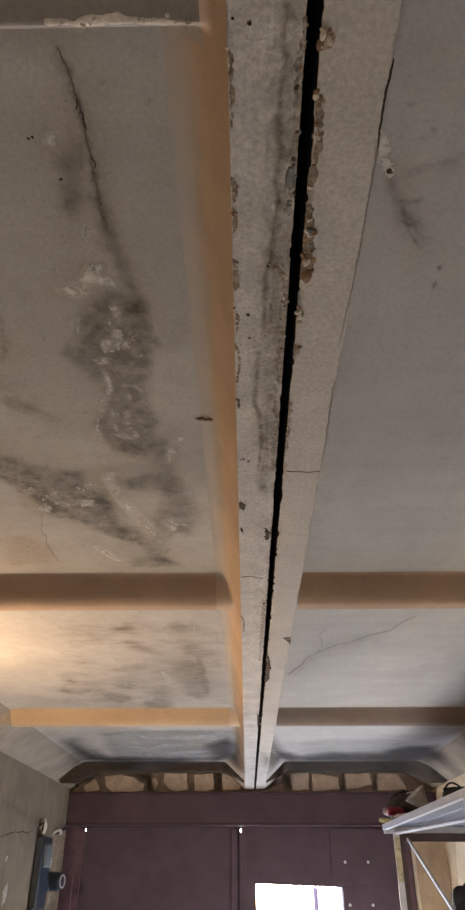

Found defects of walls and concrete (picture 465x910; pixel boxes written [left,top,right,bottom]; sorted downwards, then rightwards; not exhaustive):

crack [57,47,108,232]
spalling [264,16,336,385]
crack [340,58,395,340]
damp [61,265,116,297]
damp [77,300,150,451]
crack [286,380,335,473]
crack [289,616,416,674]